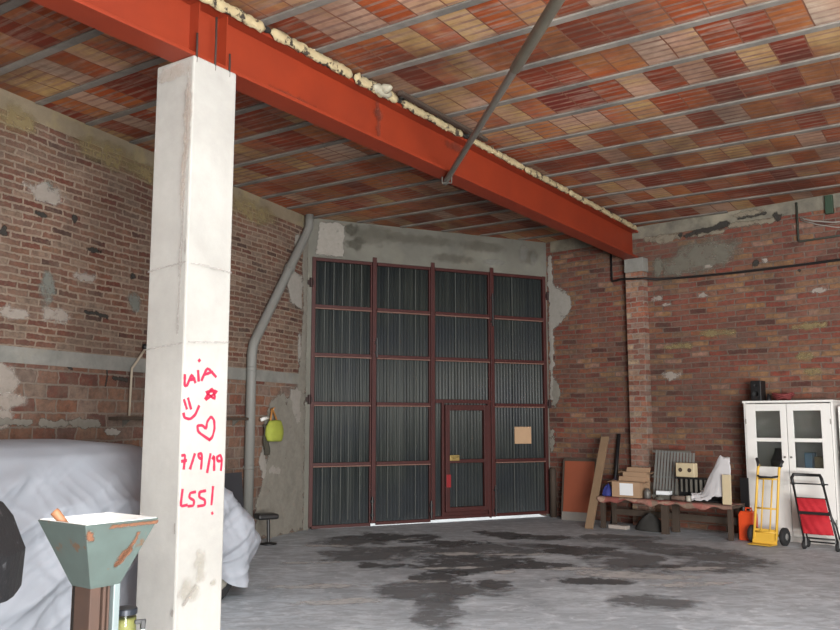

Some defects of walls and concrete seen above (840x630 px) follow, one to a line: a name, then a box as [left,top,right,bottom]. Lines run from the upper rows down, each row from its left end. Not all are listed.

spalling [654,209,782,244]
peeling [259,447,281,479]